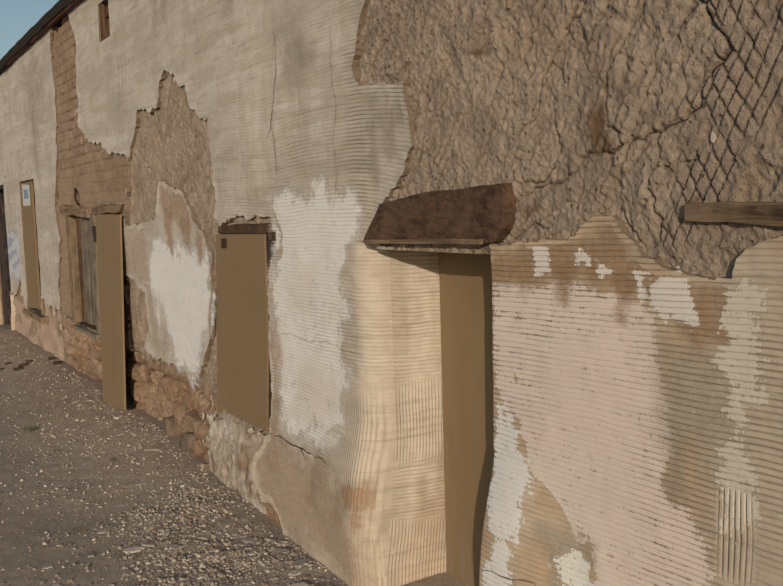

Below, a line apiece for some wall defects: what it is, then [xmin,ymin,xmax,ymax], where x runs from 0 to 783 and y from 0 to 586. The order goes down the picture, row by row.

crack [266,62,276,182]
crack [582,0,732,158]
peeling [41,14,363,455]
spalling [358,0,783,586]
spalling [202,407,283,530]
crack [265,430,327,465]